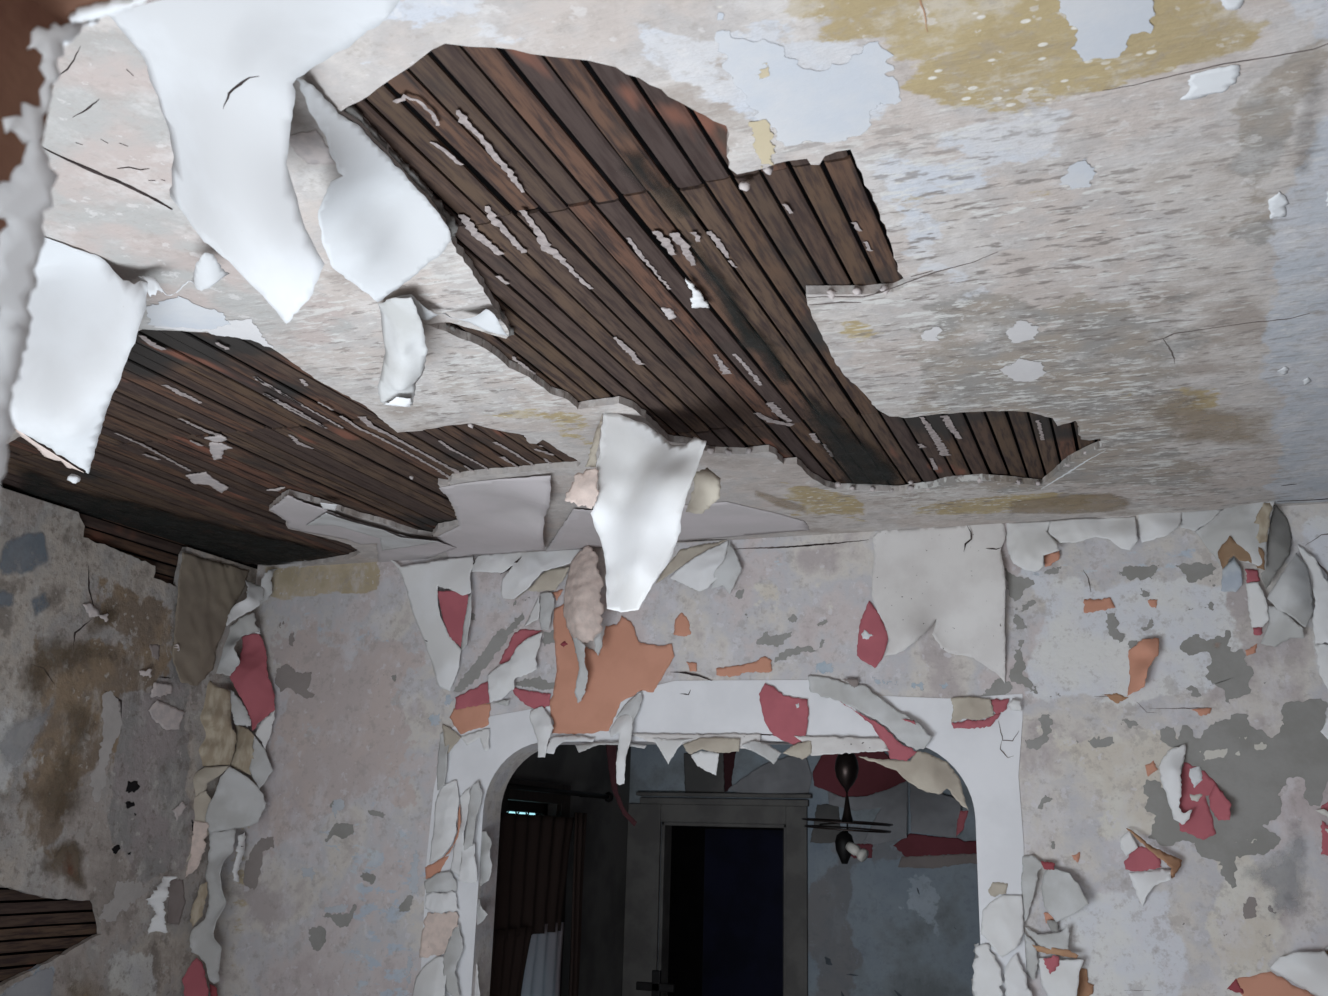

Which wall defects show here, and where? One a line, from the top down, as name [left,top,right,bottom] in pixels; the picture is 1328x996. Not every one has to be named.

spalling [1059,0,1155,61]
crack [1102,43,1328,91]
crack [43,99,173,210]
spalling [0,0,577,585]
spalling [344,13,1101,493]
damp [29,610,115,691]
spalling [981,567,1061,696]
spalling [1106,612,1154,648]
damp [45,690,122,817]
spalling [1143,630,1328,919]
damp [45,841,83,885]
spalling [0,887,97,996]